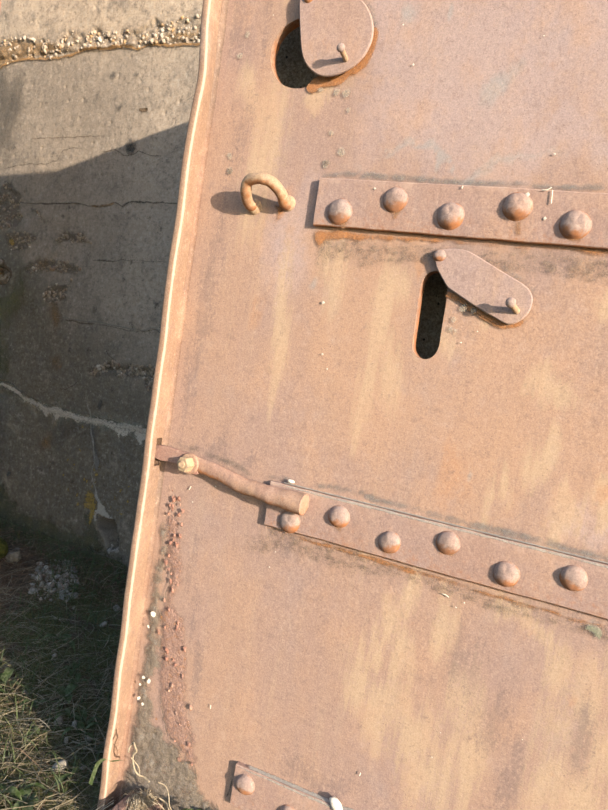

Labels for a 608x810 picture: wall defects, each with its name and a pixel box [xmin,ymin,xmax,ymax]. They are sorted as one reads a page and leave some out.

corrosion [307,27,379,93]
spalling [0,181,36,252]
corrosion [315,219,440,245]
spalling [24,258,81,305]
spalling [88,360,155,391]
crack [0,380,146,502]
spalling [93,501,120,554]
corrosion [155,489,197,779]